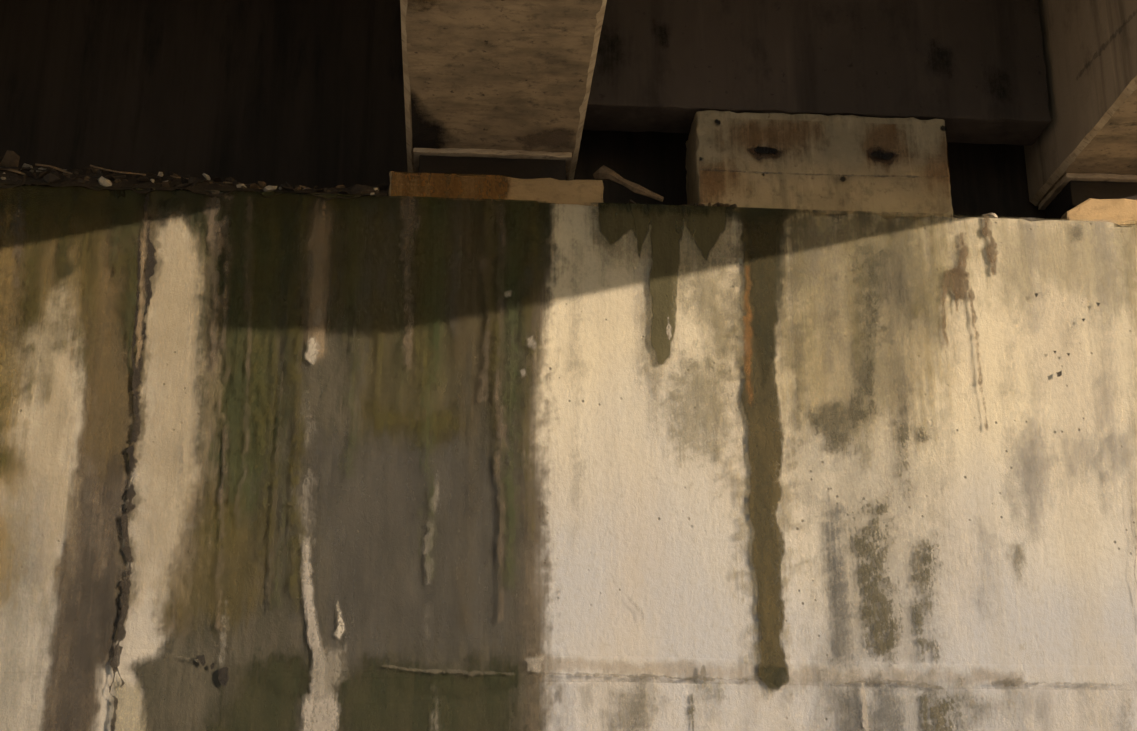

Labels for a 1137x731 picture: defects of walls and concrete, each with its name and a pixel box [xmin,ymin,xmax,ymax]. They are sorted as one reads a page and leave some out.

crack [109,188,157,731]
damp [0,184,560,731]
damp [599,203,726,364]
damp [715,212,945,690]